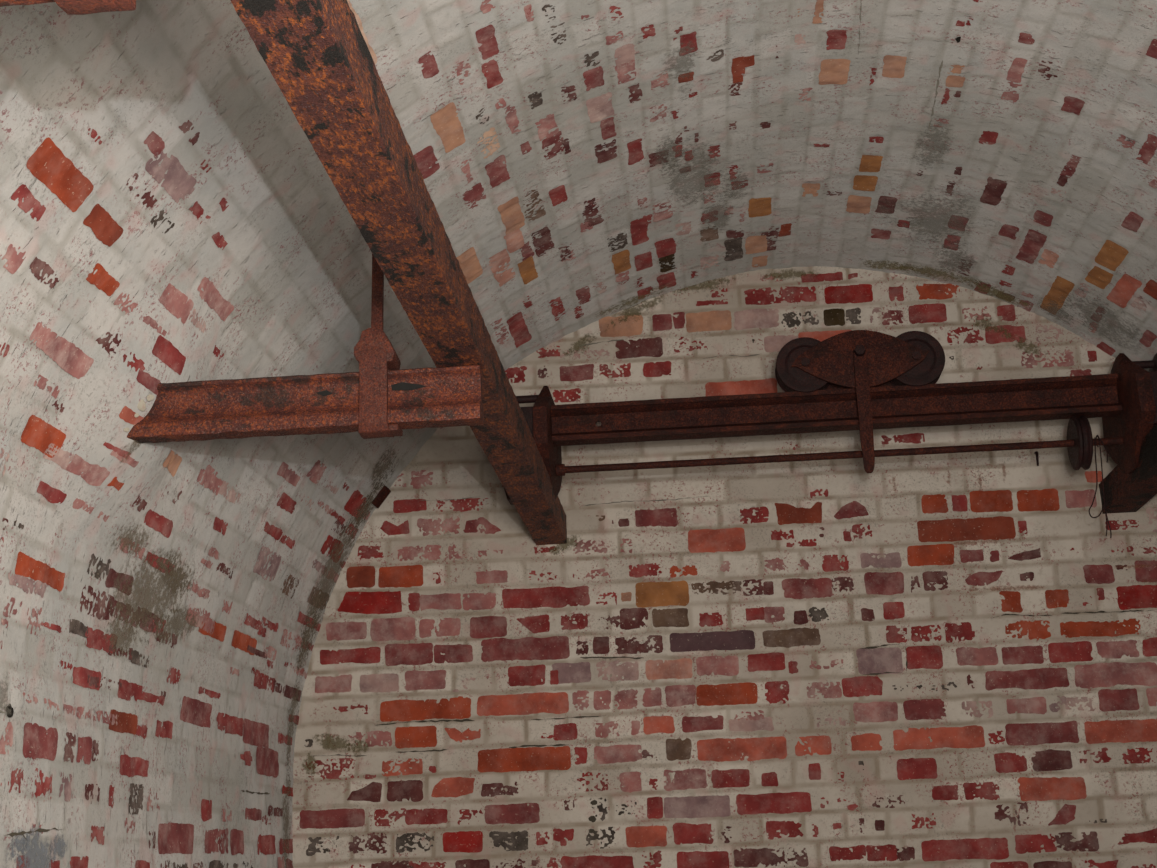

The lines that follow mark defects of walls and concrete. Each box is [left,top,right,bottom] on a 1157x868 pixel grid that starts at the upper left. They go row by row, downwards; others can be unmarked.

peeling [413,0,571,209]
peeling [561,5,721,173]
peeling [673,26,755,96]
peeling [797,0,851,101]
peeling [11,137,123,247]
peeling [126,131,229,233]
peeling [802,136,910,240]
peeling [0,244,59,289]
peeling [159,277,234,333]
peeling [549,163,1157,376]
peeling [21,263,186,491]
water stain [115,525,149,552]